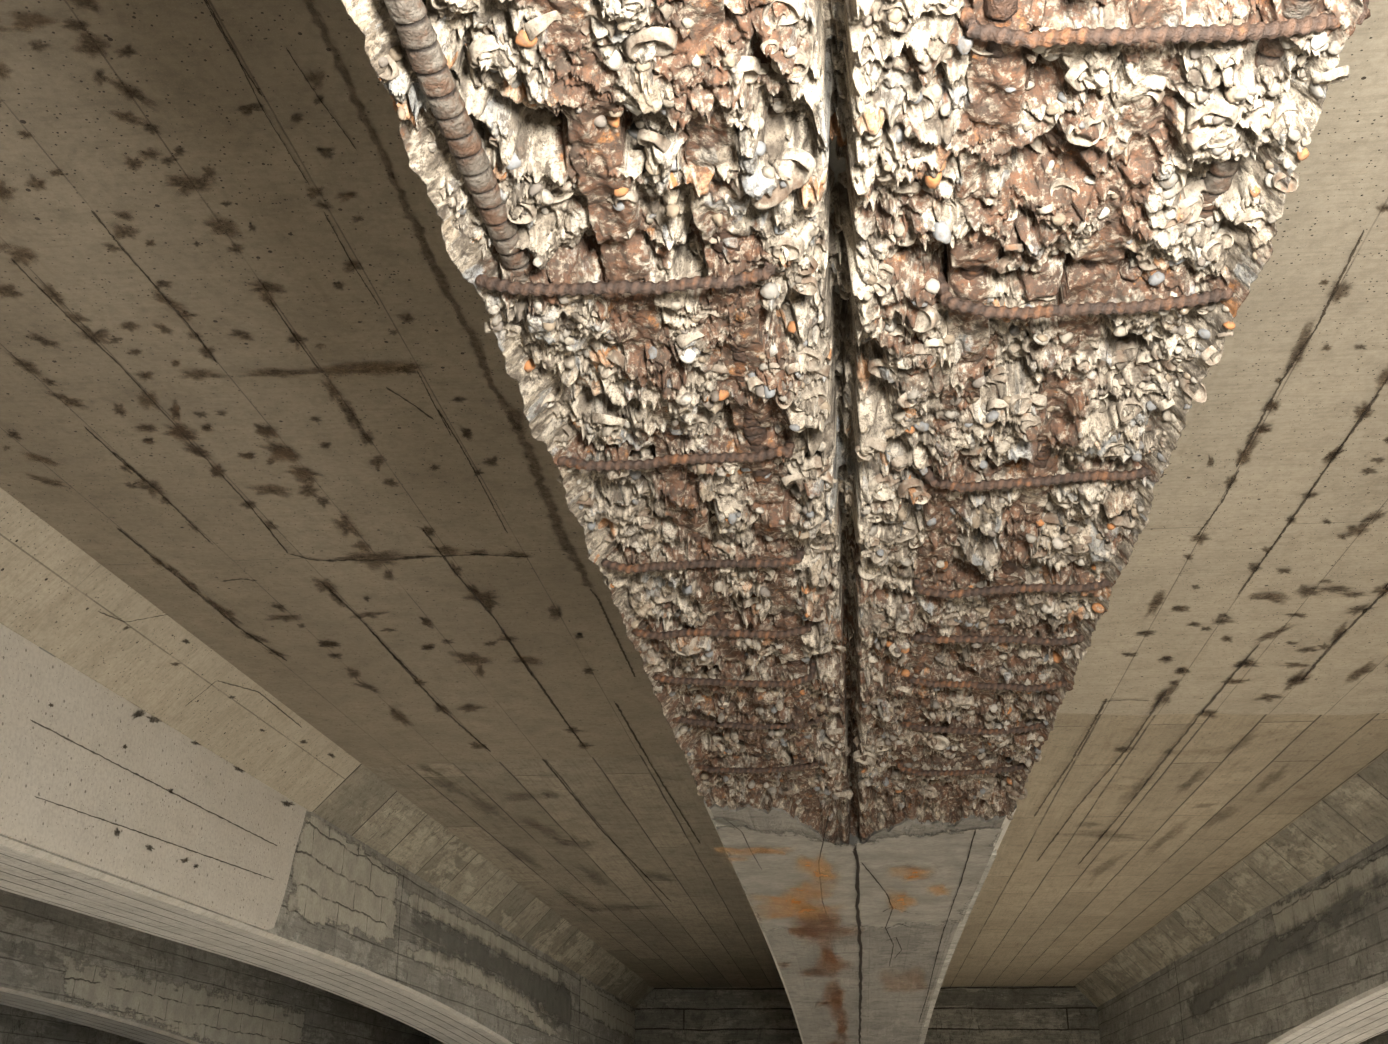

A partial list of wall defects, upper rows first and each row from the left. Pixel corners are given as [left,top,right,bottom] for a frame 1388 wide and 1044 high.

leakage [95,72,215,194]
leakage [240,424,329,508]
crack [12,259,583,752]
spalling [341,0,1371,932]
leakage [1226,401,1279,487]
crack [1197,230,1364,535]
crack [1238,382,1386,594]
leakage [1148,595,1232,642]
leakage [1252,580,1388,701]
crack [31,720,277,880]
rust [796,914,847,1044]
crack [818,815,976,1044]